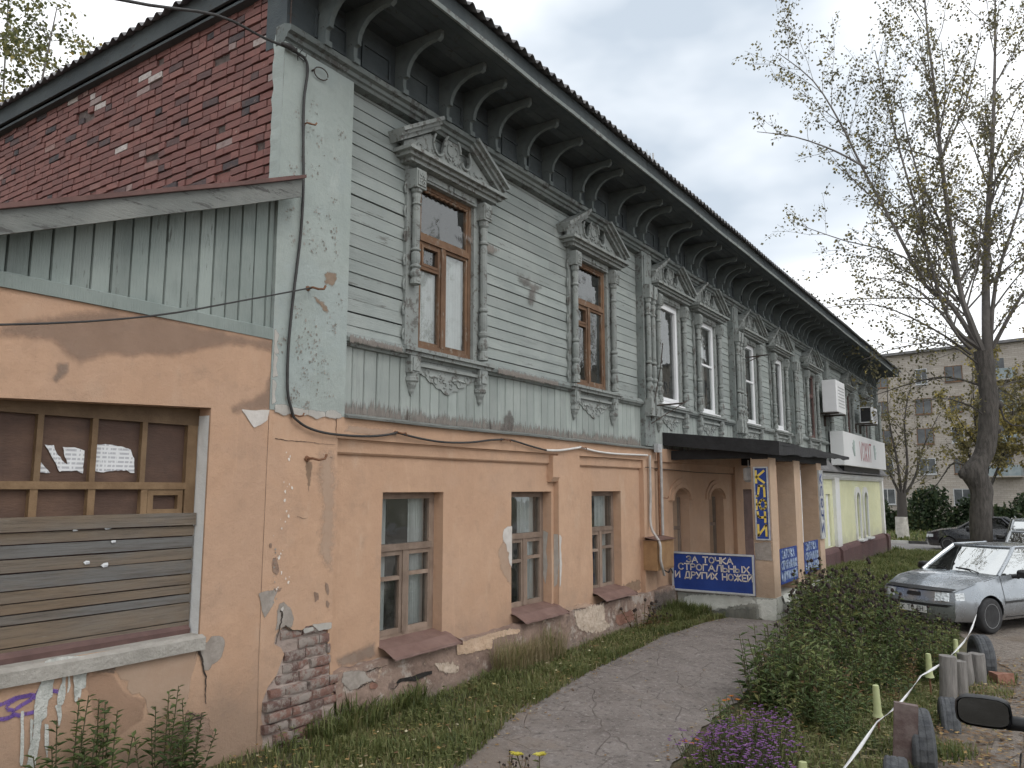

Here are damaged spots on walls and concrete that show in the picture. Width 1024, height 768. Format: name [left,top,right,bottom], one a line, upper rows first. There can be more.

damp [5,314,273,358]
peeling [242,272,491,429]
damp [234,387,271,410]
peeling [499,526,512,582]
flaking render [256,483,378,752]
peeling [574,603,610,634]
peeling [115,636,225,748]
crack [194,651,207,703]
peeling [435,628,520,674]